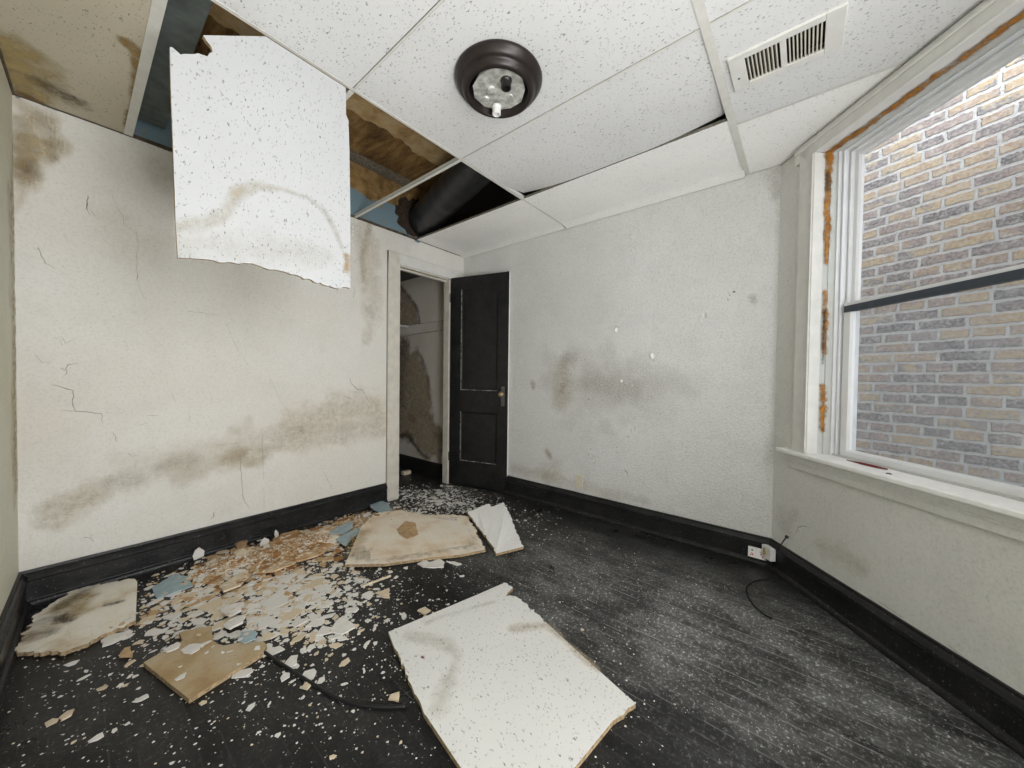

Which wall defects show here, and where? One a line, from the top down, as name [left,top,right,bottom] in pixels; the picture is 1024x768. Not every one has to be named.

leakage [0,36,78,105]
leakage [119,37,141,97]
rust [824,11,1024,264]
spalling [395,197,421,238]
rust [819,384,827,432]